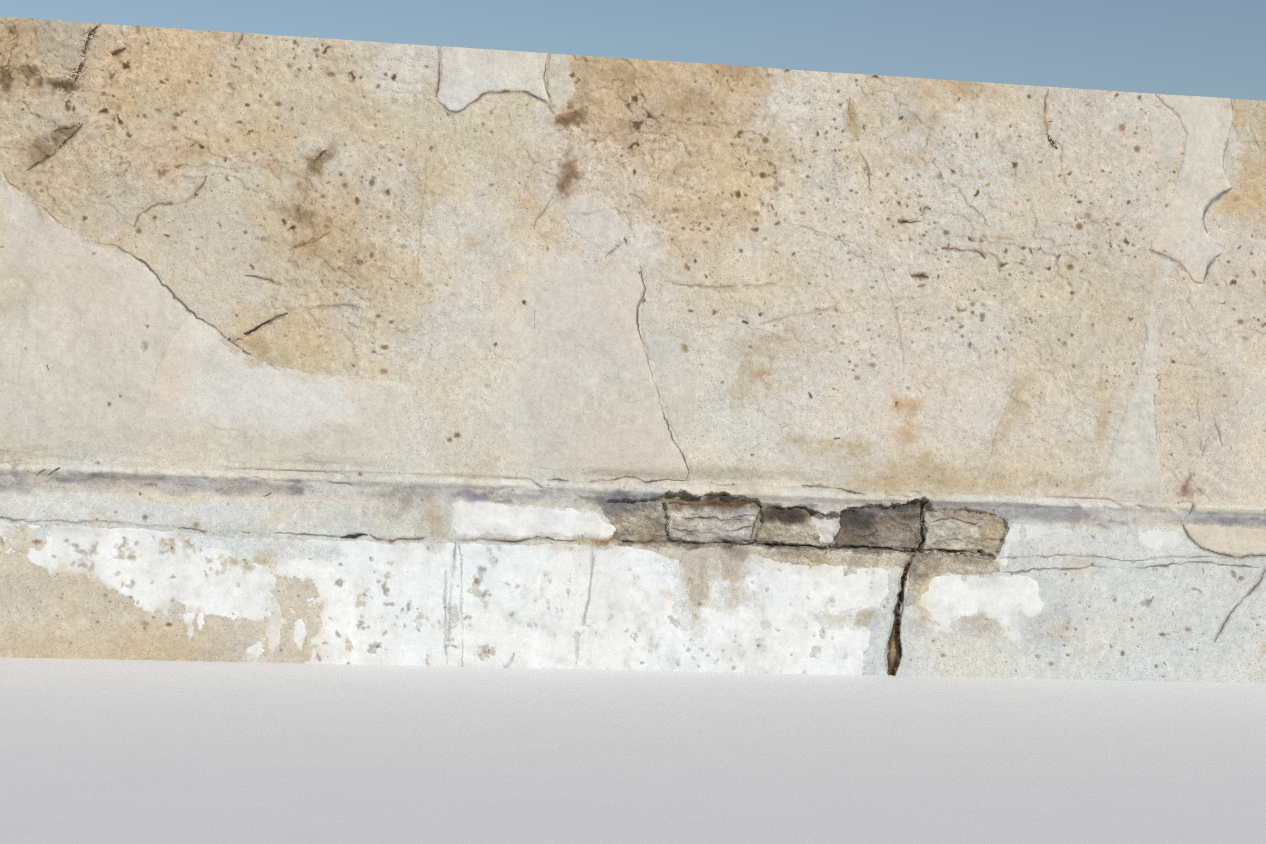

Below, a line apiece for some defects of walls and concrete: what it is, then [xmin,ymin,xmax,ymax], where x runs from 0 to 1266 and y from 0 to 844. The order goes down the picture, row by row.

spalling [98,106,133,139]
spalling [347,69,398,90]
flaking render [424,46,581,112]
spalling [619,93,657,177]
flaking render [1102,94,1242,494]
crack [547,240,776,485]
crack [732,305,835,400]
peeling [0,169,1057,675]
crack [36,467,60,485]
crack [0,515,615,551]
crack [1001,395,1266,642]
crack [885,550,940,676]